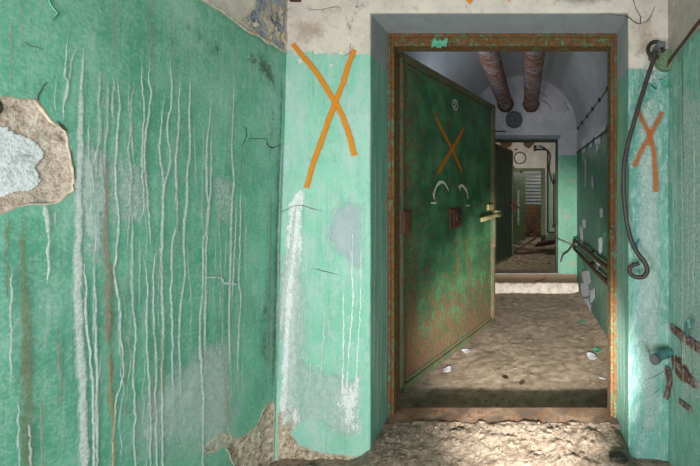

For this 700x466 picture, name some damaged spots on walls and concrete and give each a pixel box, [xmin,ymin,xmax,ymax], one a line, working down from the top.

peeling [205,0,303,64]
spalling [0,83,76,215]
crack [242,126,284,148]
leakage [42,206,56,282]
leakage [54,2,247,466]
leakage [276,184,362,434]
rust [671,340,693,387]
spalling [204,400,357,466]